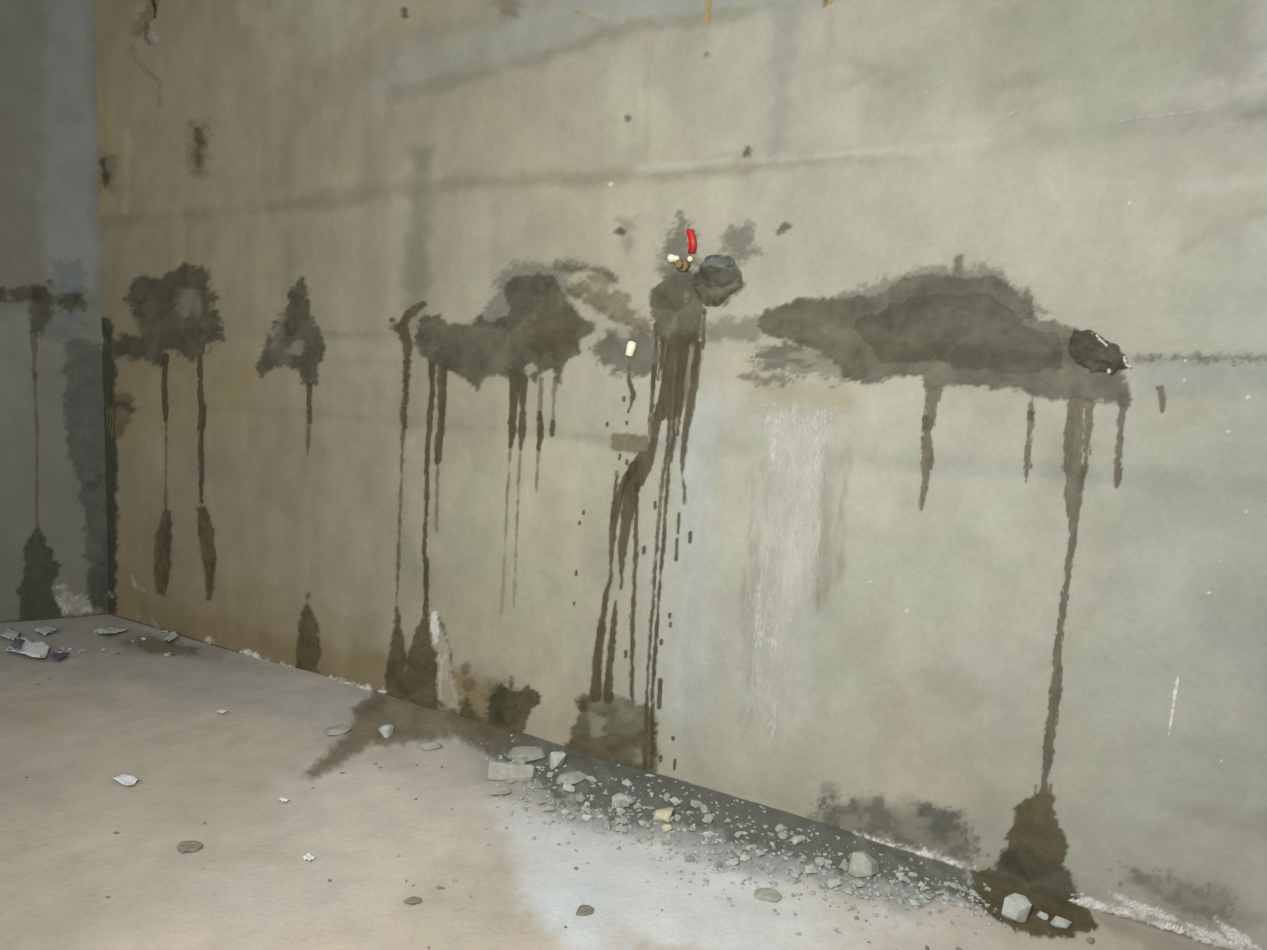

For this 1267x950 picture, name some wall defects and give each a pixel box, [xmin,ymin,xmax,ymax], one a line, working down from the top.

water stain [16,264,224,622]
water stain [256,277,325,447]
water stain [281,213,1262,950]